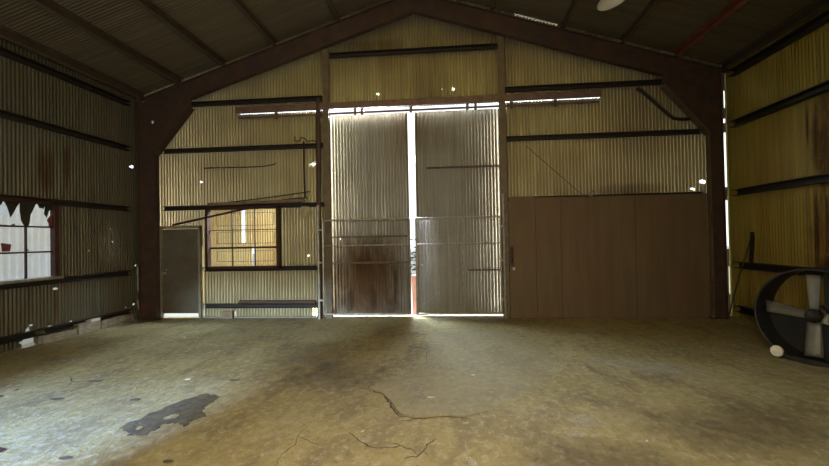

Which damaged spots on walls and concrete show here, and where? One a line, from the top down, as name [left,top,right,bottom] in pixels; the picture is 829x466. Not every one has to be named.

crack [362,384,462,421]
crack [349,432,435,466]